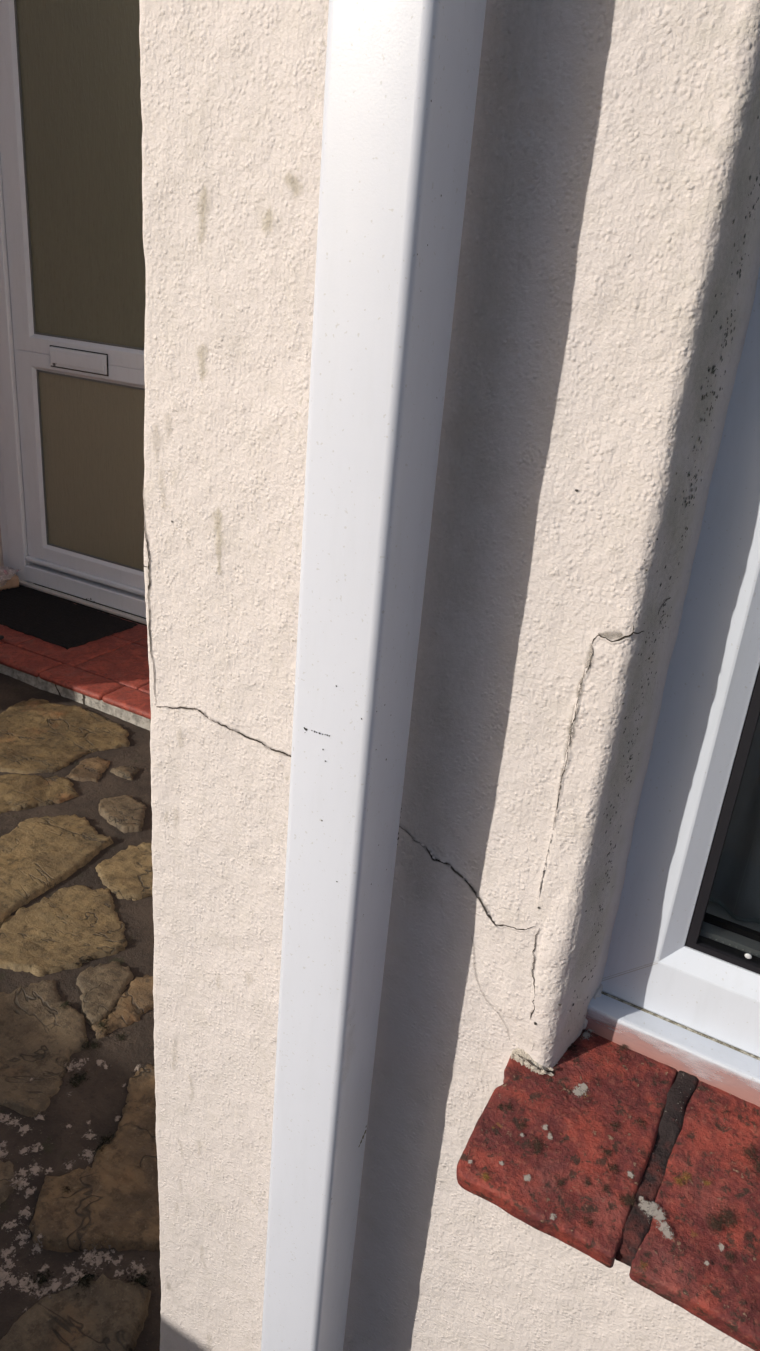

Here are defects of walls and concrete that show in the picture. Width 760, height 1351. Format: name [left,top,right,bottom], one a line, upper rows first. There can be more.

water stain [700,293,735,421]
crack [143,498,291,757]
crack [539,597,671,892]
crack [402,828,540,1050]